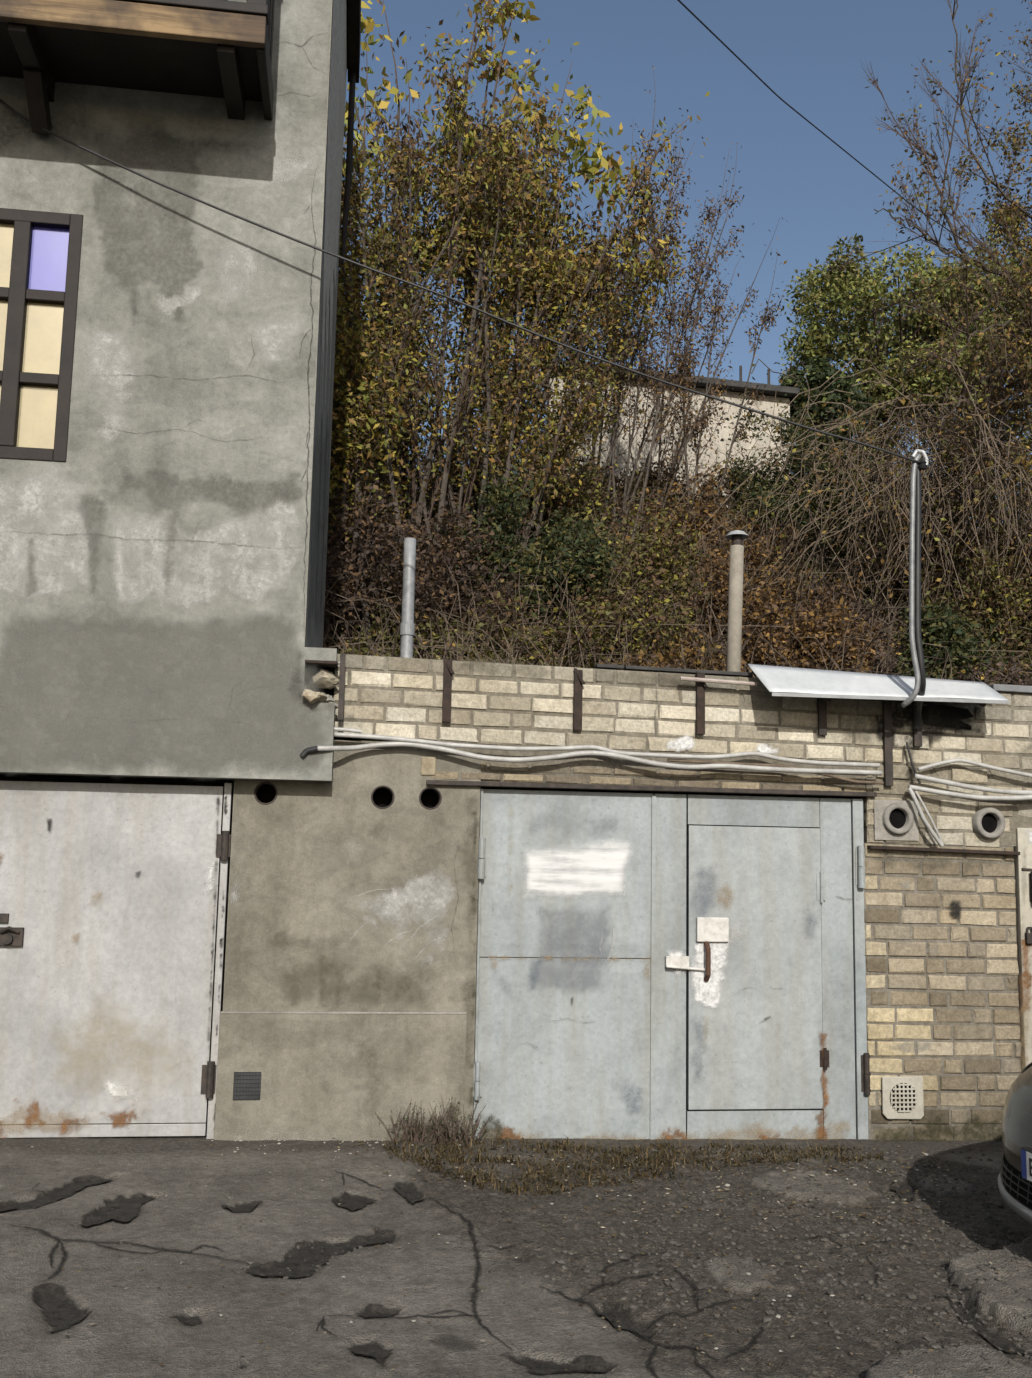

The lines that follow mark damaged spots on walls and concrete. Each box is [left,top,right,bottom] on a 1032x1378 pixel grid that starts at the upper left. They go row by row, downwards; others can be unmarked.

leakage [0,112,196,314]
leakage [0,474,103,594]
leakage [115,441,328,618]
rust [0,1103,77,1134]
rust [109,1111,136,1127]
rust [486,1128,520,1139]
rust [795,1033,845,1140]